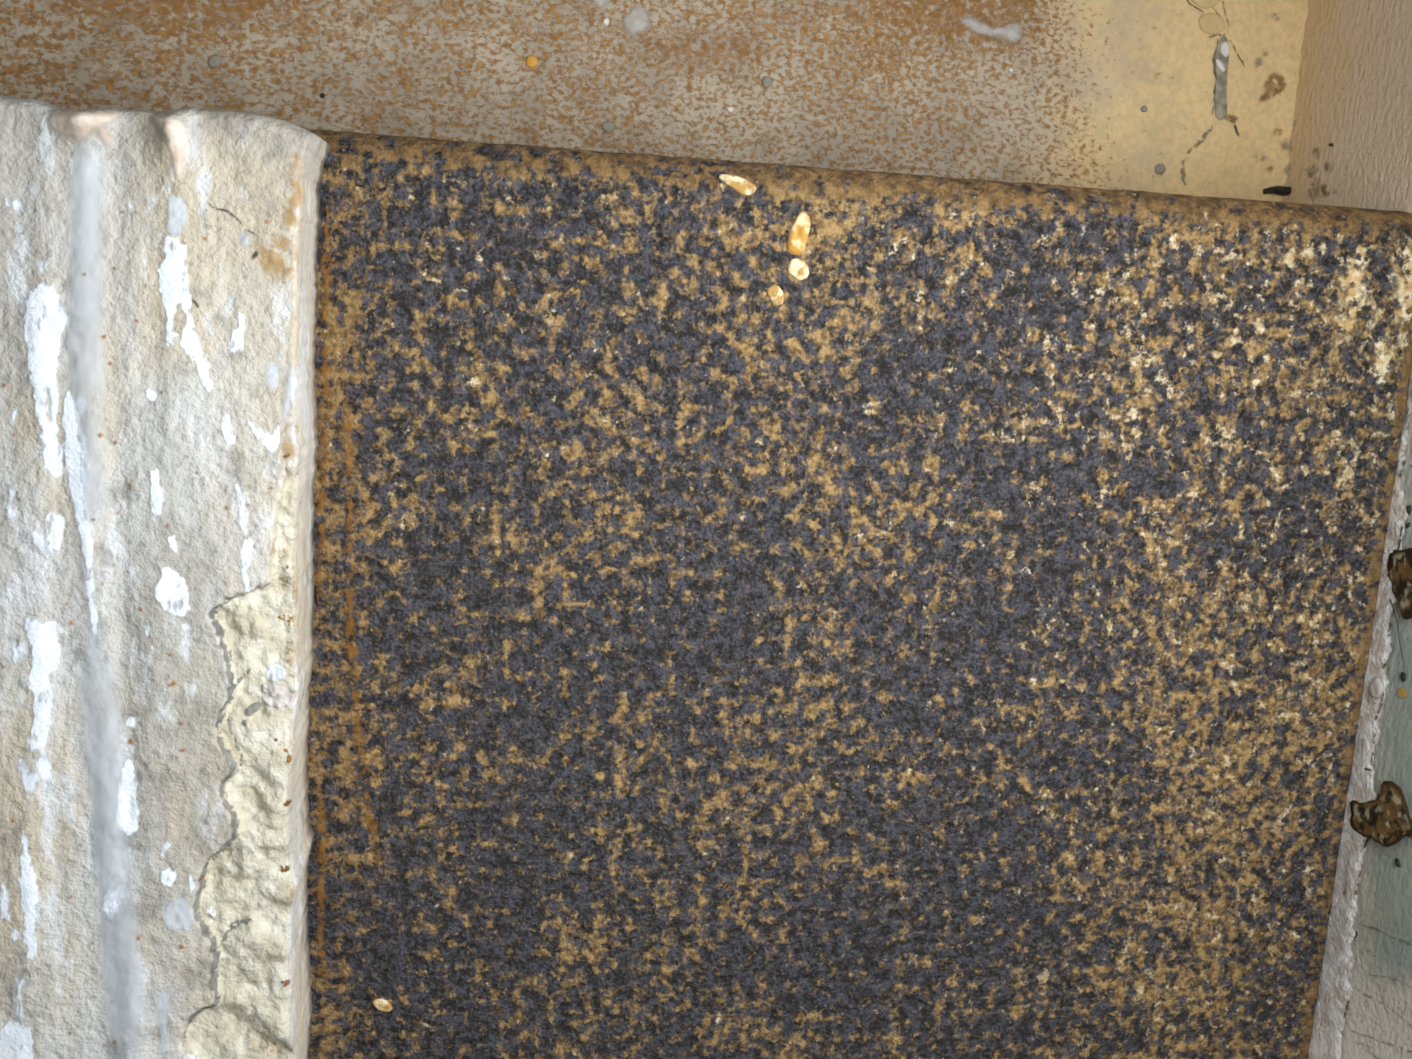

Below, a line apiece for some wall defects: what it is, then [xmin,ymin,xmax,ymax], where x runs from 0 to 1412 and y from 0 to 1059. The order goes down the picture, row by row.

rust [0,0,1132,190]
crack [1181,0,1245,185]
rust [263,188,301,271]
efflorescence [1338,241,1412,340]
efflorescence [1366,341,1394,383]
spalling [183,468,297,1059]
rust [347,500,384,882]
rust [318,788,328,988]